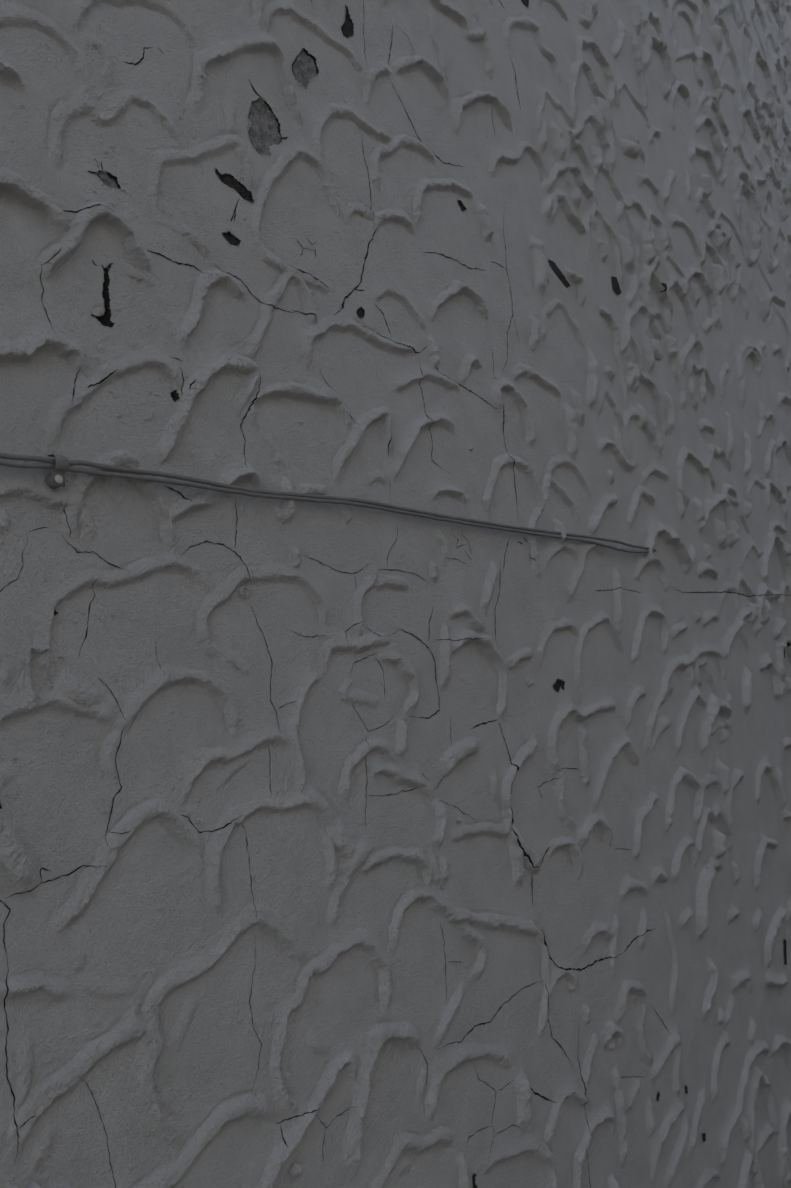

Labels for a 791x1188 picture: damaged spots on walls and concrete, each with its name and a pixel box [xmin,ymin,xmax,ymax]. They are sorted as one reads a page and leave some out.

spalling [88,159,121,188]
spalling [248,80,288,156]
spalling [292,48,319,90]
crack [148,139,577,902]
crack [0,504,130,1162]
crack [181,814,262,1102]
crack [420,929,653,1188]
crack [80,1077,116,1188]
crack [276,1107,351,1162]